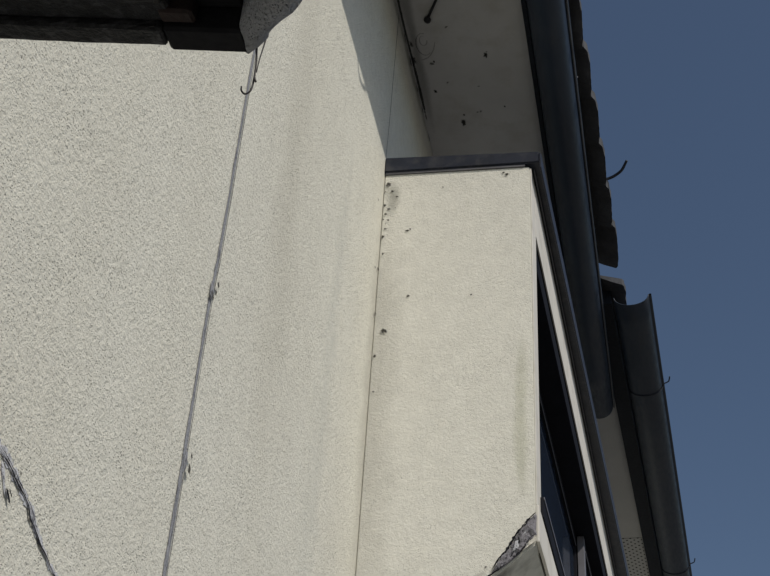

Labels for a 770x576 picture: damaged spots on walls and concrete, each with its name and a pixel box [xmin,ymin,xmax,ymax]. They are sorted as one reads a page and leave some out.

crack [0,439,58,576]
spalling [487,512,537,576]